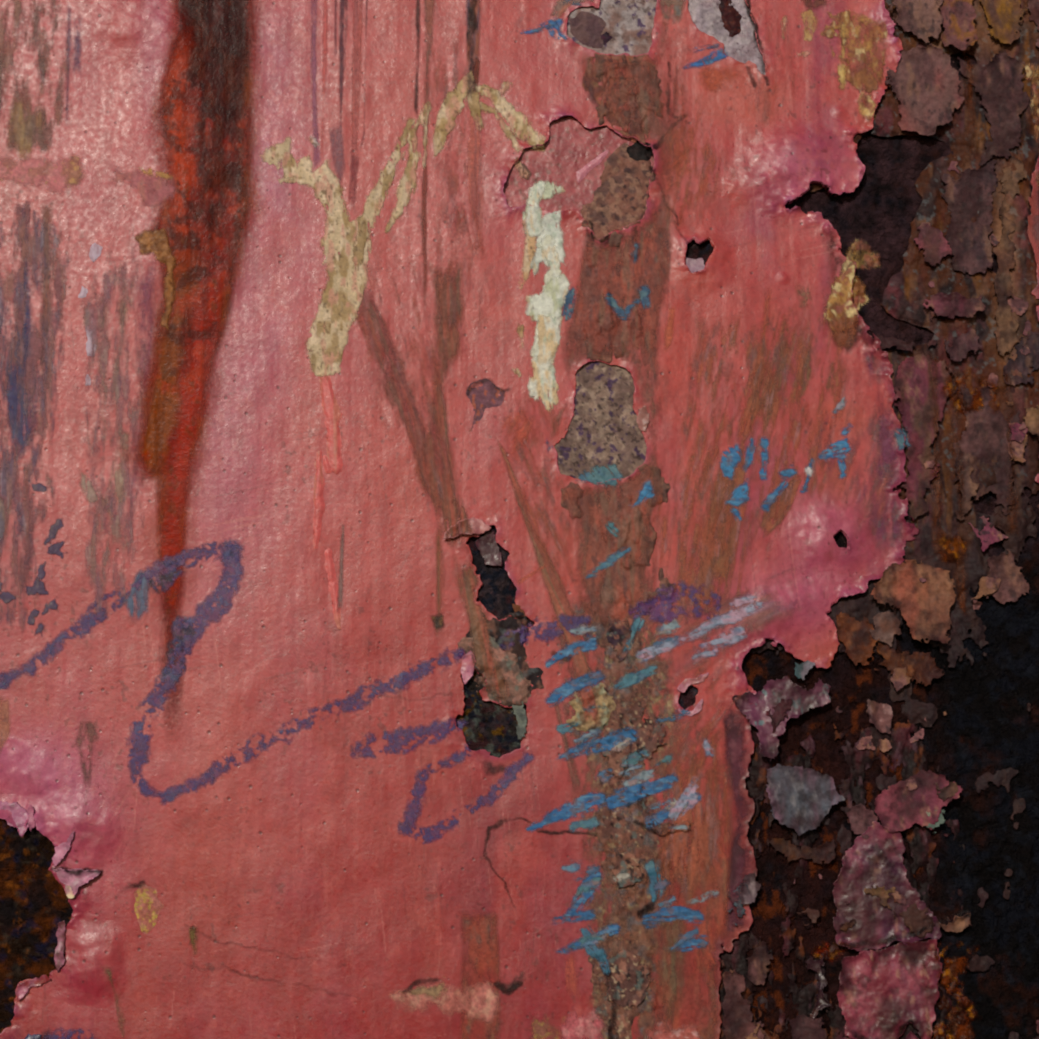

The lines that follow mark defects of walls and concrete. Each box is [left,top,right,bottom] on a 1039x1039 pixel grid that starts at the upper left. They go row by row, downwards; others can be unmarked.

peeling [884,0,979,136]
rust [135,0,257,702]
peeling [503,0,769,628]
rust [853,0,1039,668]
peeling [869,559,956,648]
peeling [732,676,831,761]
peeling [52,831,101,899]
crack [485,818,595,845]
rust [711,578,940,1039]
rust [901,813,965,908]
peeling [836,939,943,1039]
rust [900,938,995,1039]